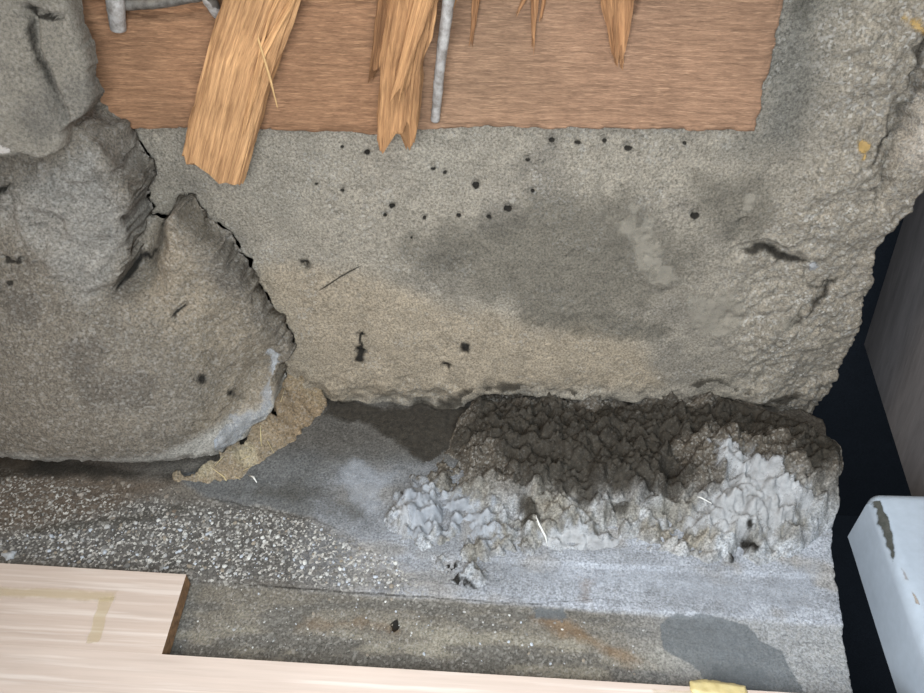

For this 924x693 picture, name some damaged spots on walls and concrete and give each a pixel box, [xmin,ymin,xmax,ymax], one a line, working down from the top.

crack [27,6,58,83]
crack [116,249,157,289]
water stain [324,379,841,505]
water stain [392,476,500,543]
water stain [519,497,537,524]
water stain [537,520,622,551]
water stain [685,438,813,545]